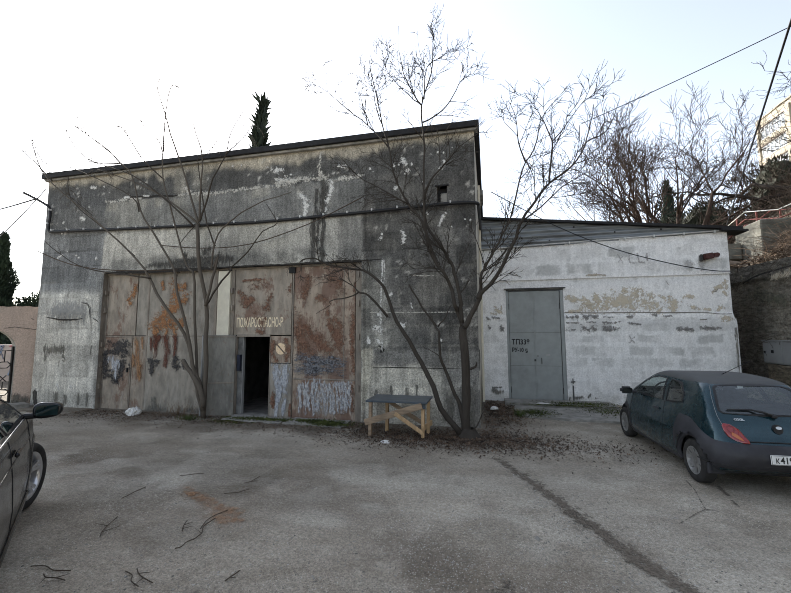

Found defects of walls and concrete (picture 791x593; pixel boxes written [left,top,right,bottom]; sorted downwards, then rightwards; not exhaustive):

leakage [299,175,334,264]
rust [132,278,191,381]
rust [237,278,273,335]
rust [269,274,356,375]
peeling [565,286,731,322]